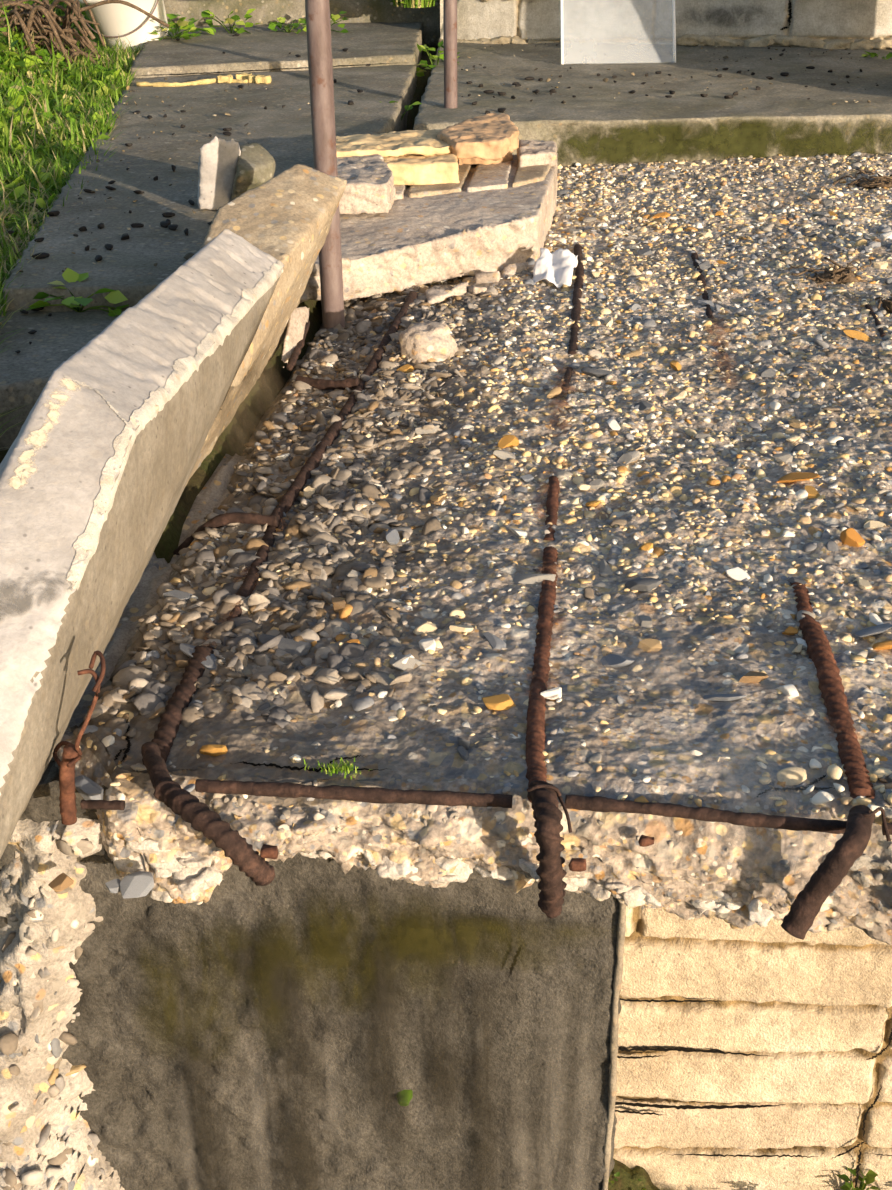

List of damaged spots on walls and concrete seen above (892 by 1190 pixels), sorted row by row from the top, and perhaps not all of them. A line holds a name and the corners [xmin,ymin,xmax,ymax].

spalling [111,839,224,903]
corrosion [260,844,279,859]
spalling [357,849,540,884]
corrosion [568,858,586,872]
corrosion [638,835,654,847]
spalling [564,878,661,908]
spalling [691,890,775,927]
crack [620,996,721,1004]
crack [617,1047,768,1059]
crack [615,1102,785,1115]
damp [279,1103,320,1190]
crack [668,1087,892,1188]